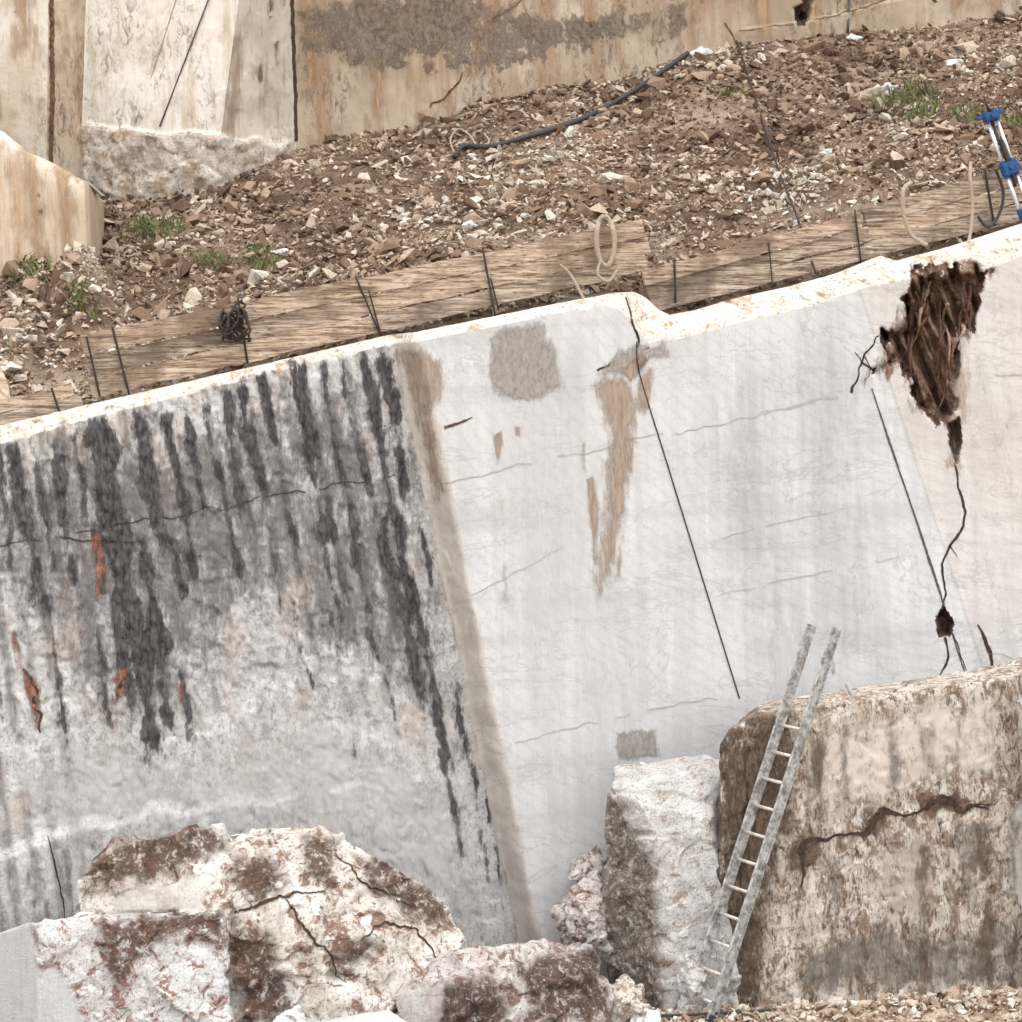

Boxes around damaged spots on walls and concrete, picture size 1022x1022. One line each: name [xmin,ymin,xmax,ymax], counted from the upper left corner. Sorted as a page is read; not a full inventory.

crack [724,0,886,45]
water stain [490,323,560,401]
spalling [871,259,995,468]
water stain [588,355,651,593]
crack [941,463,967,609]
crack [940,632,967,675]
crack [977,624,1022,666]
crack [797,794,998,888]